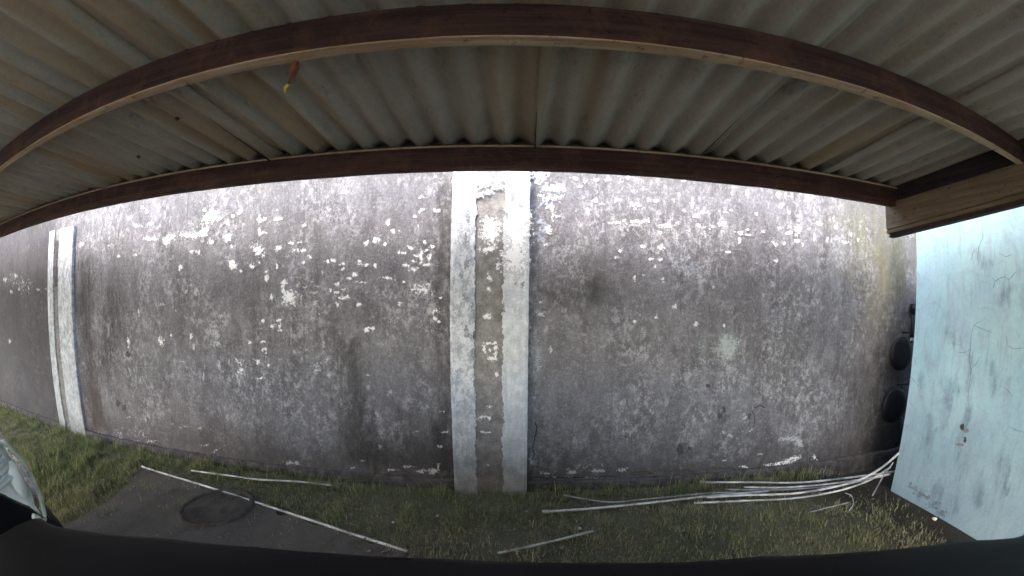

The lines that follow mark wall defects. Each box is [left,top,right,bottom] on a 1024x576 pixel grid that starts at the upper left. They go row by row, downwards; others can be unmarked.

peeling [451,171,698,292]
peeling [692,209,871,281]
peeling [134,191,444,453]
peeling [530,298,553,373]
crack [959,320,1021,410]
crack [531,423,617,479]